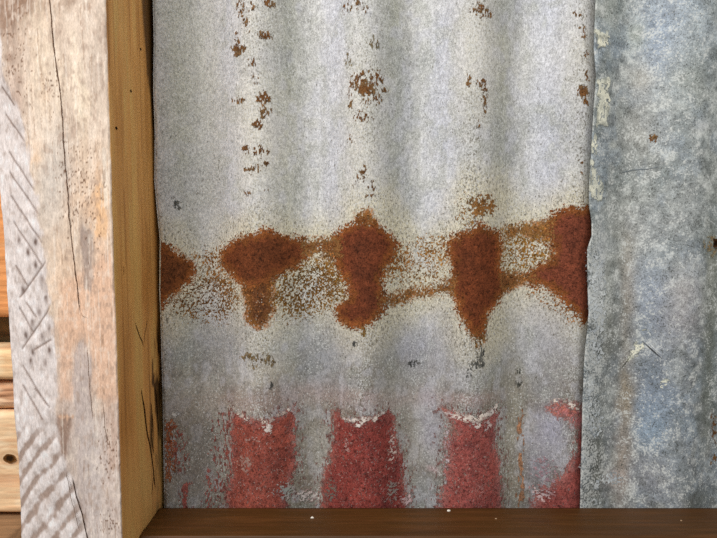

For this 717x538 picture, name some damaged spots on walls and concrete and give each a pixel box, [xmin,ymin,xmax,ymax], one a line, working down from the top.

rust [230,31,256,67]
rust [236,0,273,39]
rust [345,53,389,122]
crack [49,0,84,317]
rust [160,70,611,439]
peeling [201,401,417,508]
peeling [425,397,512,512]
peeling [528,398,582,508]
rust [586,472,623,508]